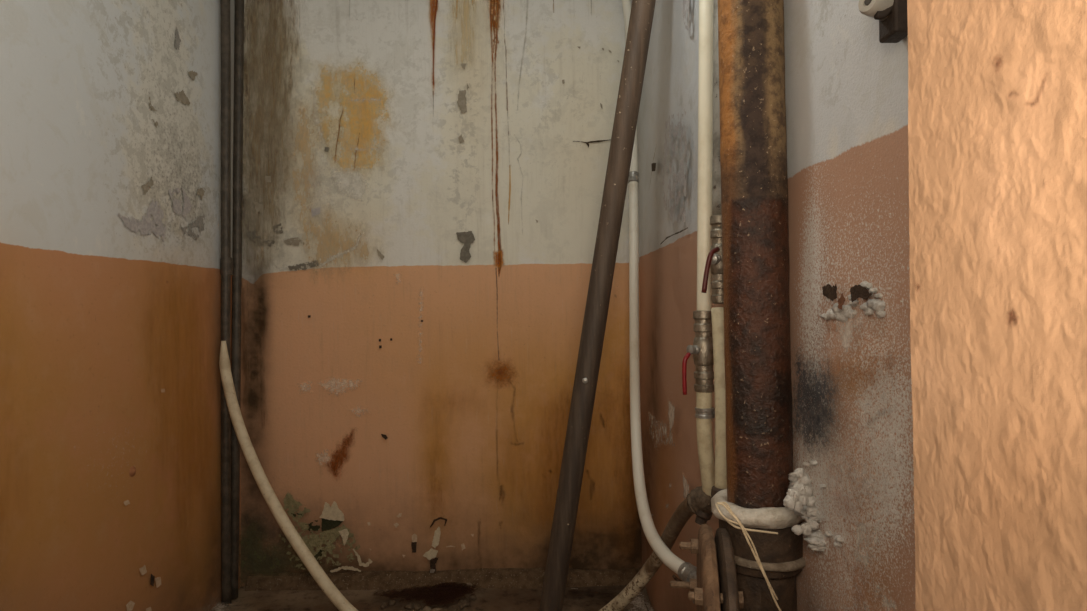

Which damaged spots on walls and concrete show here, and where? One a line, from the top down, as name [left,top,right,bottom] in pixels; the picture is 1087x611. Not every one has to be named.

corrosion [430,0,438,107]
peeling [174,90,190,105]
peeling [457,84,469,113]
water stain [243,0,389,267]
corrosion [490,0,511,319]
peeling [118,177,205,242]
peeling [456,231,475,263]
spalling [820,281,886,347]
water stain [793,355,837,451]
corrosion [328,434,352,476]
peeling [239,492,372,585]